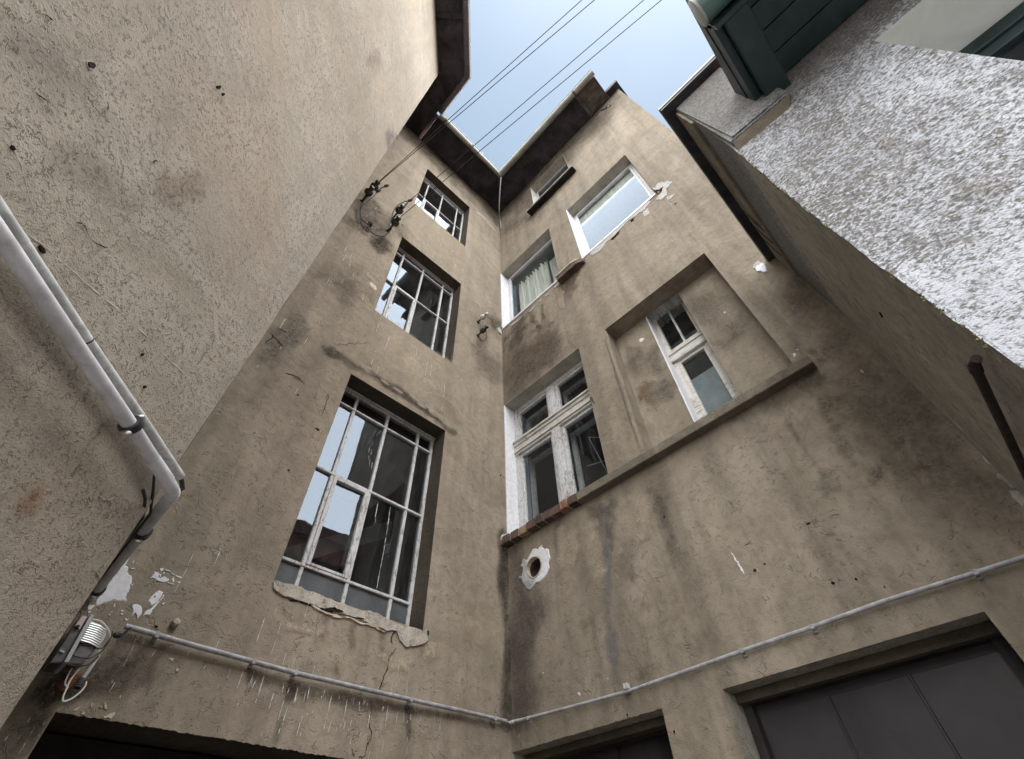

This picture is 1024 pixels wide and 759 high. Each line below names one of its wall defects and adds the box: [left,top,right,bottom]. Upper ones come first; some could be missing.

spalling [589,181,676,256]
peeling [143,568,182,627]
spalling [272,580,429,648]
leakage [492,530,543,740]
leakage [269,666,457,759]
crack [351,617,396,758]